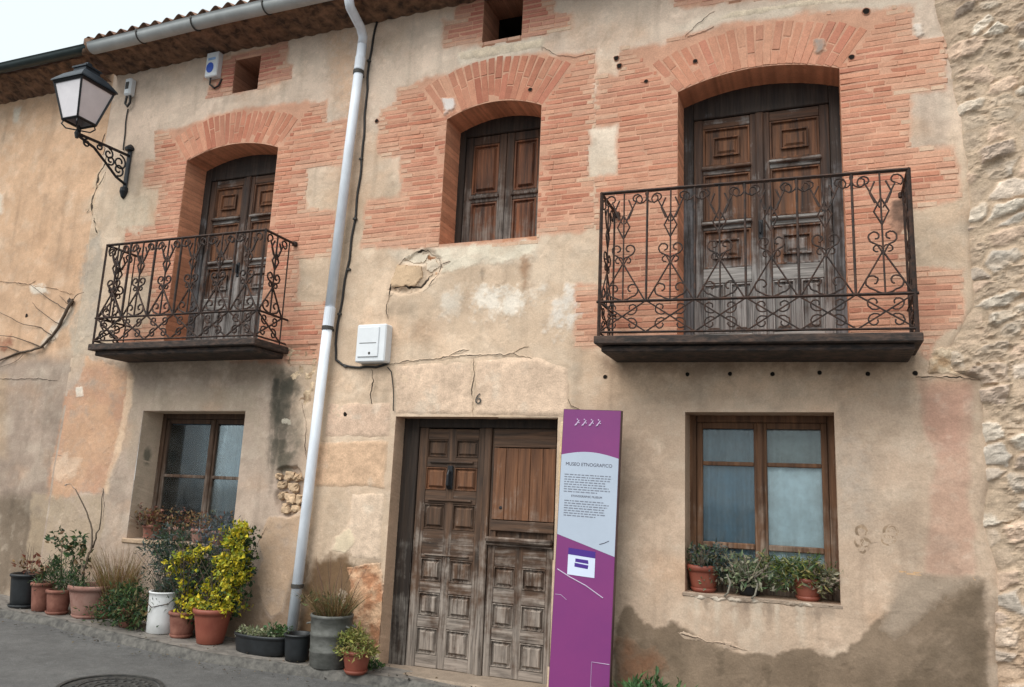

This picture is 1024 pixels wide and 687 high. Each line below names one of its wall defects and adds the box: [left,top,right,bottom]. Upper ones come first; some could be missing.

peeling [384,238,540,318]
leakage [121,360,309,500]
crack [368,346,533,412]
leakage [614,560,1000,687]